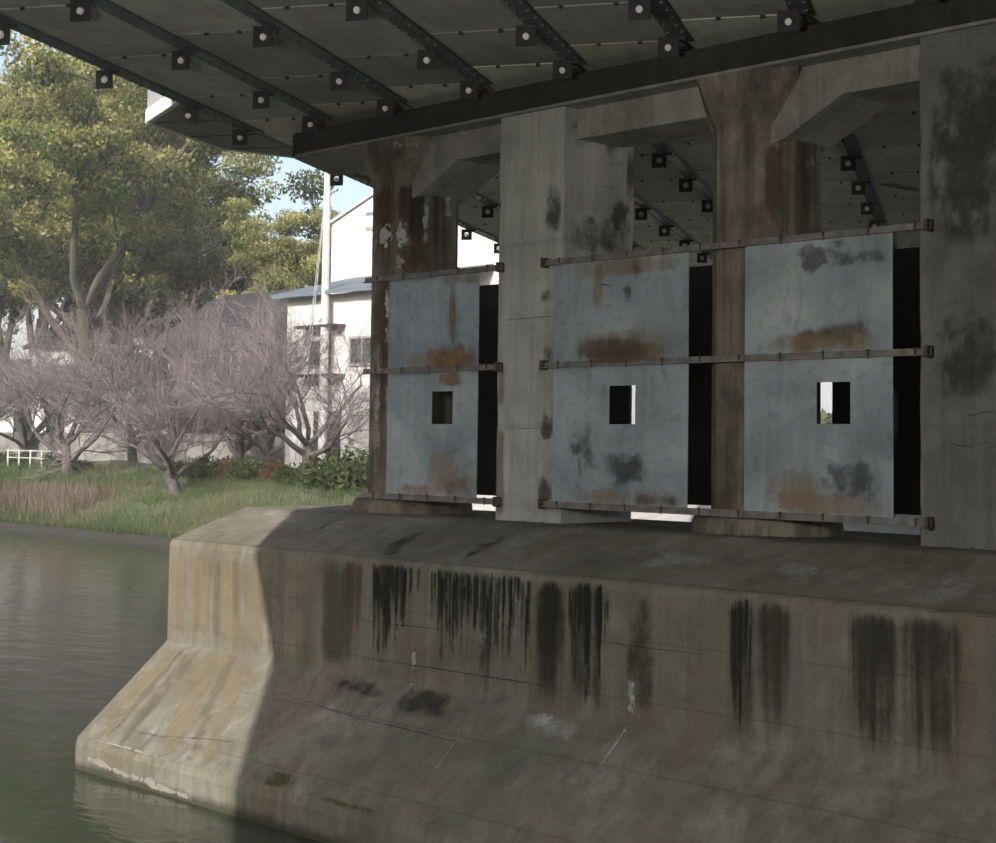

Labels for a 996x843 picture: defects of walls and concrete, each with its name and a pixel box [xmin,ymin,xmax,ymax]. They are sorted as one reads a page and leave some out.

peeling [380,222,409,270]
corrosion [436,294,472,385]
corrosion [588,339,654,362]
water stain [372,564,419,648]
water stain [405,684,447,714]
water stain [431,571,608,682]
water stain [730,600,788,716]
water stain [852,616,958,738]